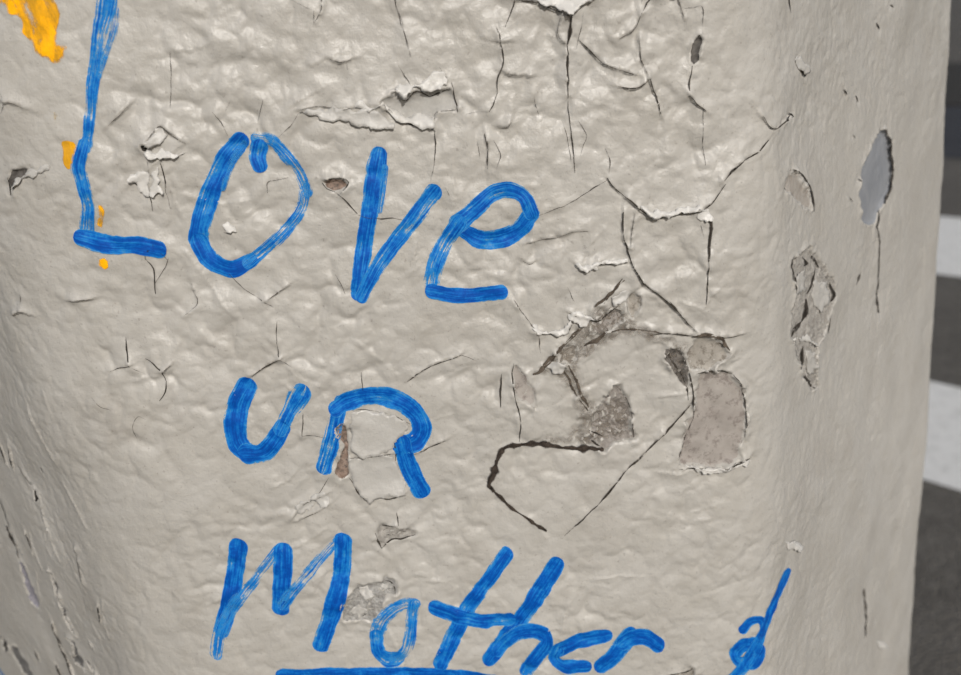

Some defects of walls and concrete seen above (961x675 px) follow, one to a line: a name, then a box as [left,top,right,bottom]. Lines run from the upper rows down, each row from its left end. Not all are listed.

peeling [7,164,50,195]
peeling [127,126,186,211]
crack [322,178,401,220]
peeling [281,67,458,168]
crack [469,0,794,411]
peeling [850,130,894,313]
crack [229,274,291,376]
peeling [790,246,836,391]
peeling [547,345,637,452]
peeling [568,290,752,475]
peeling [295,409,409,518]
crack [569,405,690,532]